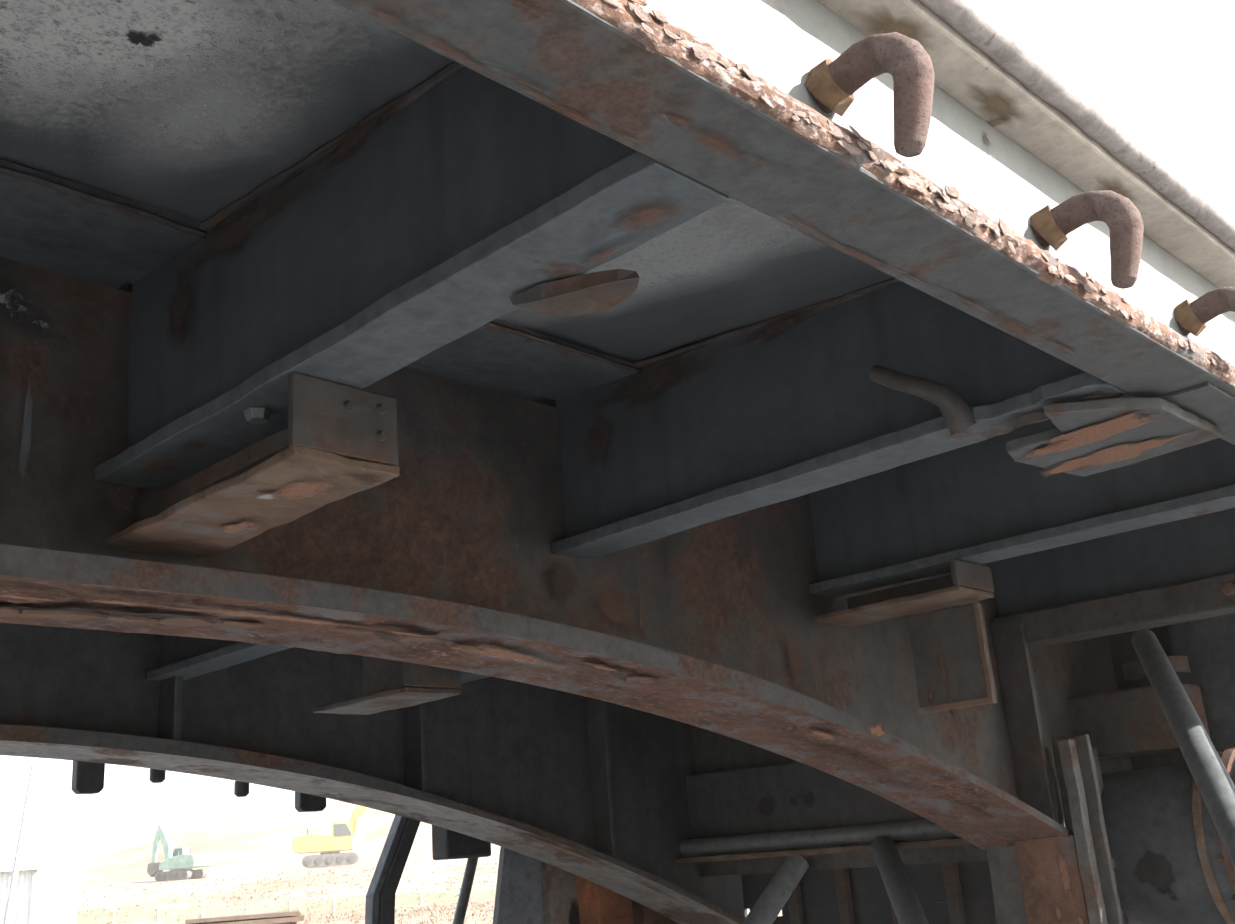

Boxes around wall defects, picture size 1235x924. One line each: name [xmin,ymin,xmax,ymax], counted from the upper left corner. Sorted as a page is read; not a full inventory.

rust [572,0,1235,387]
rust [1025,412,1183,476]
rust [259,481,329,499]
rust [94,600,359,627]
crack [325,625,480,650]
rust [455,646,557,667]
crack [565,661,667,683]